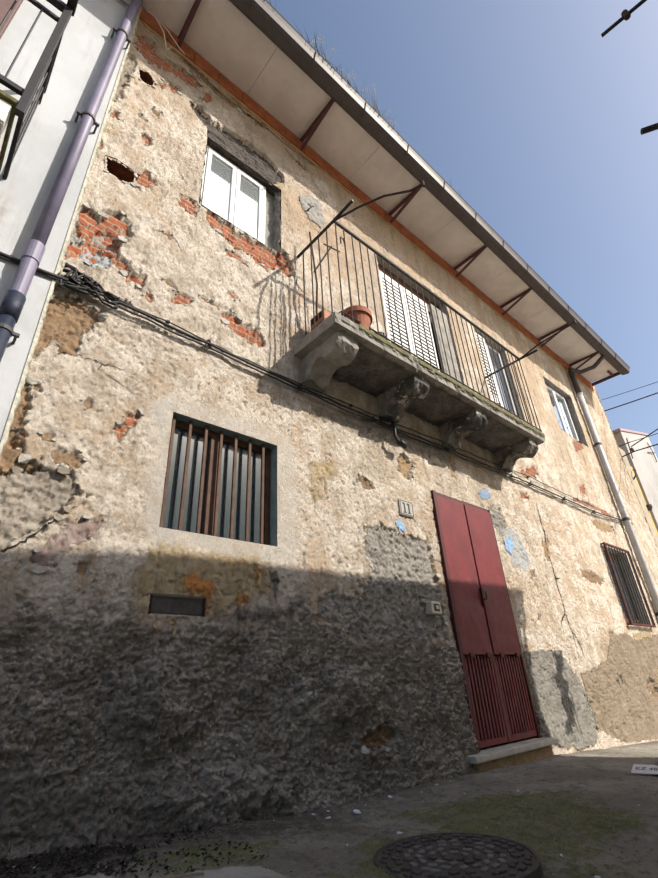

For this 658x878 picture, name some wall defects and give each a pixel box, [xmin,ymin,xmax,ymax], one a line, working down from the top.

flaking render [110,35,263,128]
spalling [99,141,156,188]
flaking render [65,203,154,302]
flaking render [178,193,294,278]
flaking render [162,277,264,348]
flaking render [112,408,145,442]
crack [0,503,84,551]
rust [133,542,271,626]
flaking render [316,523,449,643]